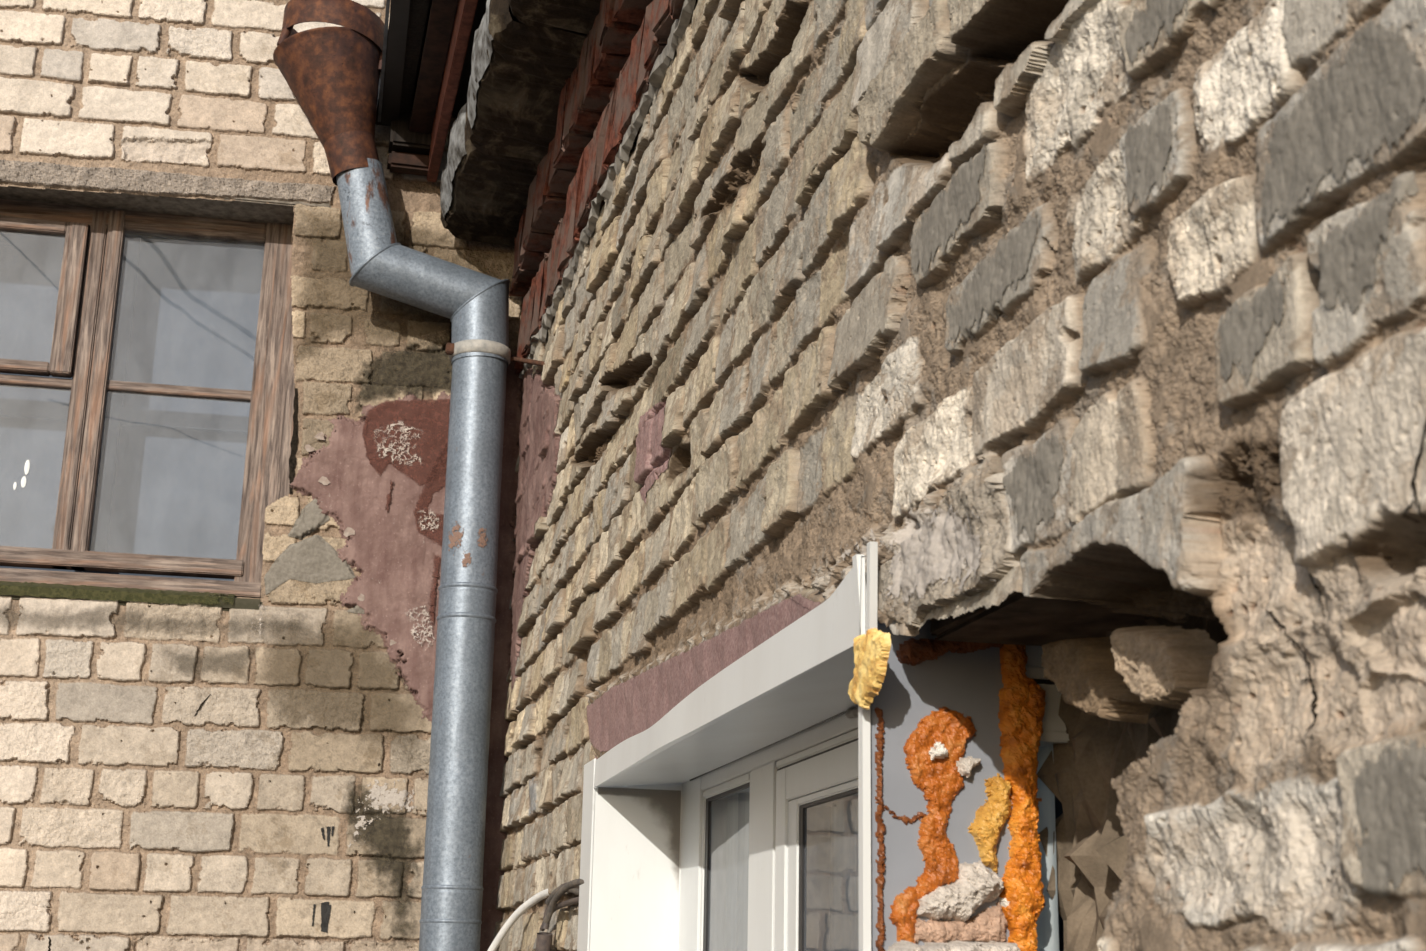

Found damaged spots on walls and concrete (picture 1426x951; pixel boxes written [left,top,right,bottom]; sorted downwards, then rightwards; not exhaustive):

water stain [362,399,450,646]
peeling [290,349,562,951]
water stain [348,779,416,847]